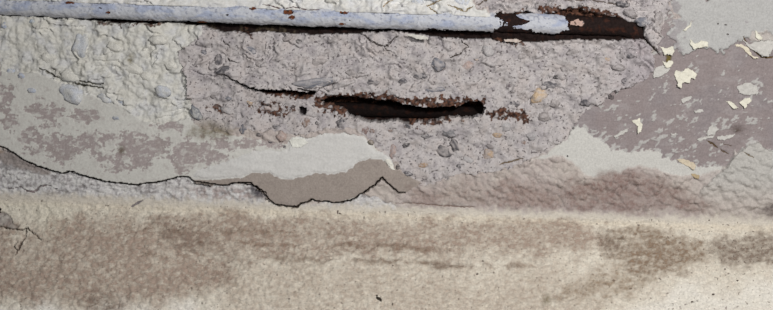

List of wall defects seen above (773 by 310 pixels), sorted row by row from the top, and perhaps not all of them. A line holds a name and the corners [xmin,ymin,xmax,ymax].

rust [538,3,623,19]
crack [39,68,104,88]
crack [223,41,264,91]
spalling [0,0,773,187]
rust [248,89,530,129]
crack [2,146,473,208]
damp [0,210,704,303]
damp [718,233,773,263]